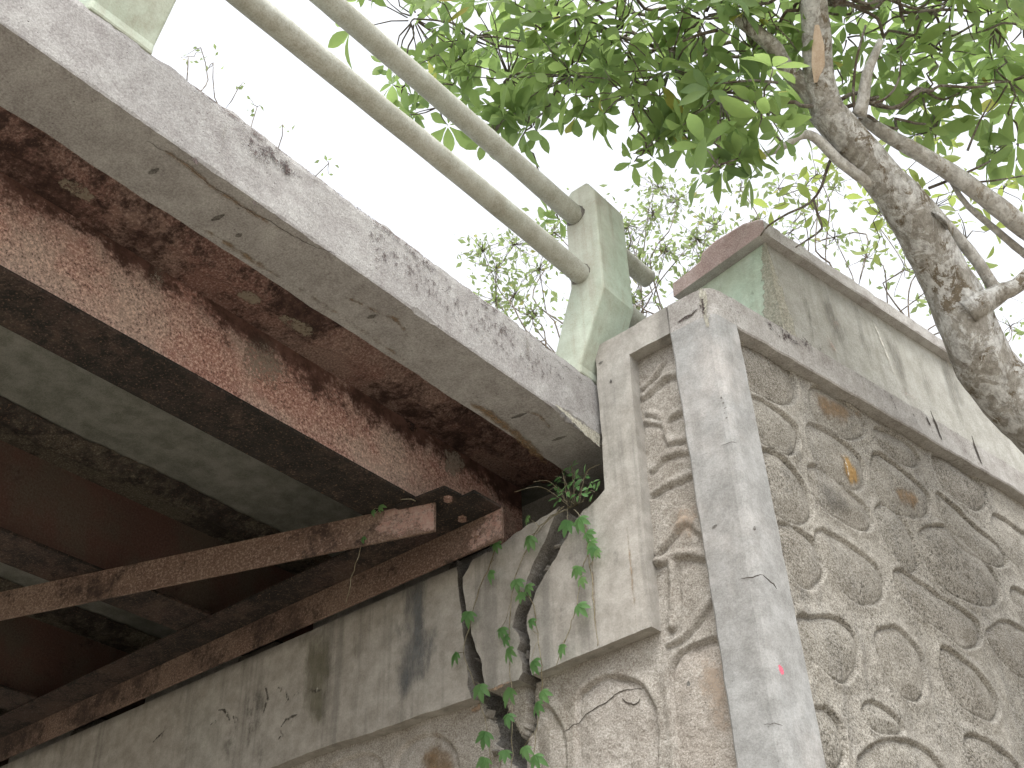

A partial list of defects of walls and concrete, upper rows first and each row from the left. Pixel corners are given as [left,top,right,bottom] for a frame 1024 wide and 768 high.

crack [544,514,577,572]
damp [401,584,432,693]
crack [485,622,541,768]
crack [565,688,641,731]